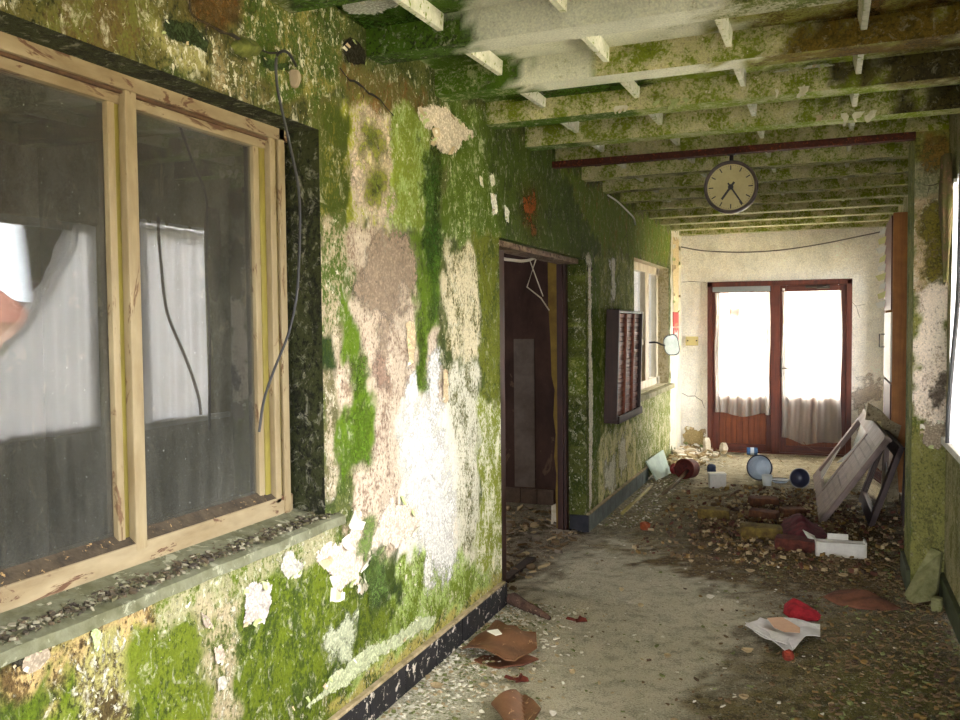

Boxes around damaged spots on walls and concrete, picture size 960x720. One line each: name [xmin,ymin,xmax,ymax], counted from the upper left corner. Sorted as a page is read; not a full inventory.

flaking render [418,104,474,155]
peeling [479,173,510,223]
leakage [351,106,445,395]
leakage [852,373,882,431]
leakage [929,372,947,408]
leakage [400,328,456,588]
peeling [281,495,423,602]
leakage [357,516,377,561]
flaking render [243,581,272,628]
leakage [323,610,359,663]